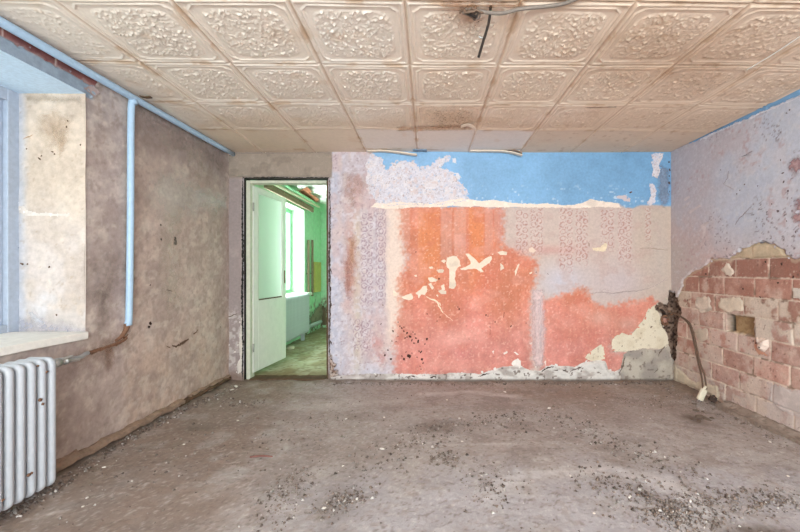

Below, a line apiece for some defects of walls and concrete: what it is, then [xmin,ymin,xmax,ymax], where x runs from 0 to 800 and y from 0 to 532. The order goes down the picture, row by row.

peeling [365,154,631,209]
peeling [647,153,671,206]
spalling [329,242,800,432]